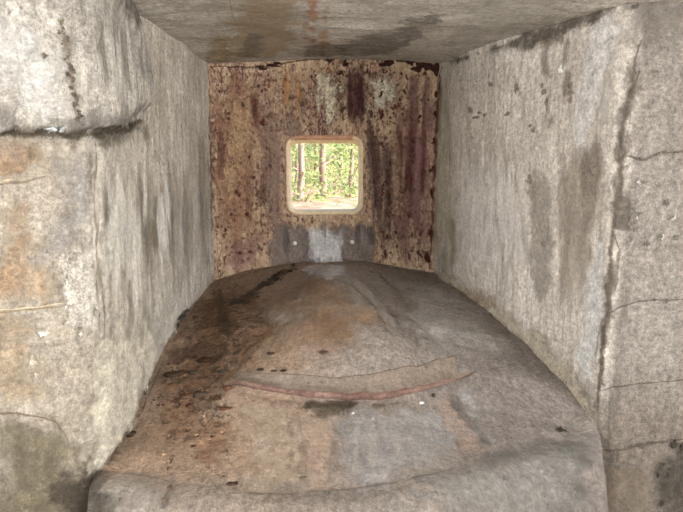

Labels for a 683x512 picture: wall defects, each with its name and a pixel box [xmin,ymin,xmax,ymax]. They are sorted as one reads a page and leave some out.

leakage [335,16,440,56]
rust [208,67,442,269]
leakage [303,229,402,337]
leakage [415,84,589,413]
leakage [491,7,620,378]
crack [595,40,683,412]
crack [604,439,683,452]